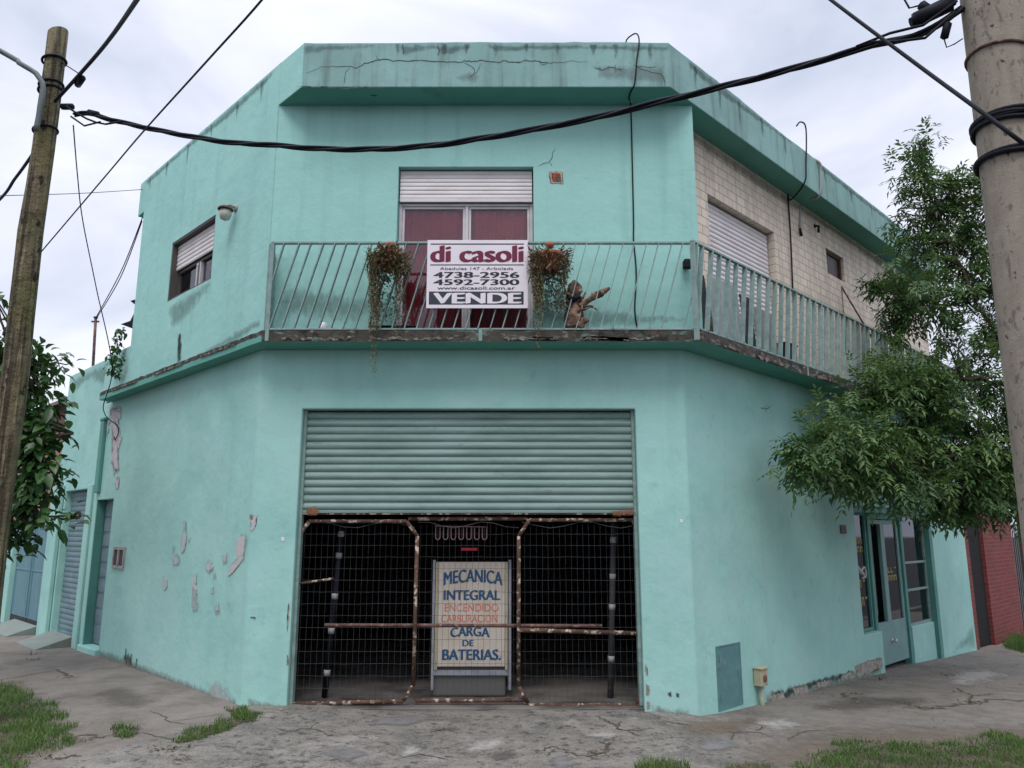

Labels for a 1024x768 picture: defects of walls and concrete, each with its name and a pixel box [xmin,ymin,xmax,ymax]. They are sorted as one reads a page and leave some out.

crack [296,44,665,89]
peeling [106,406,122,489]
peeling [191,515,257,614]
spalling [855,657,883,678]